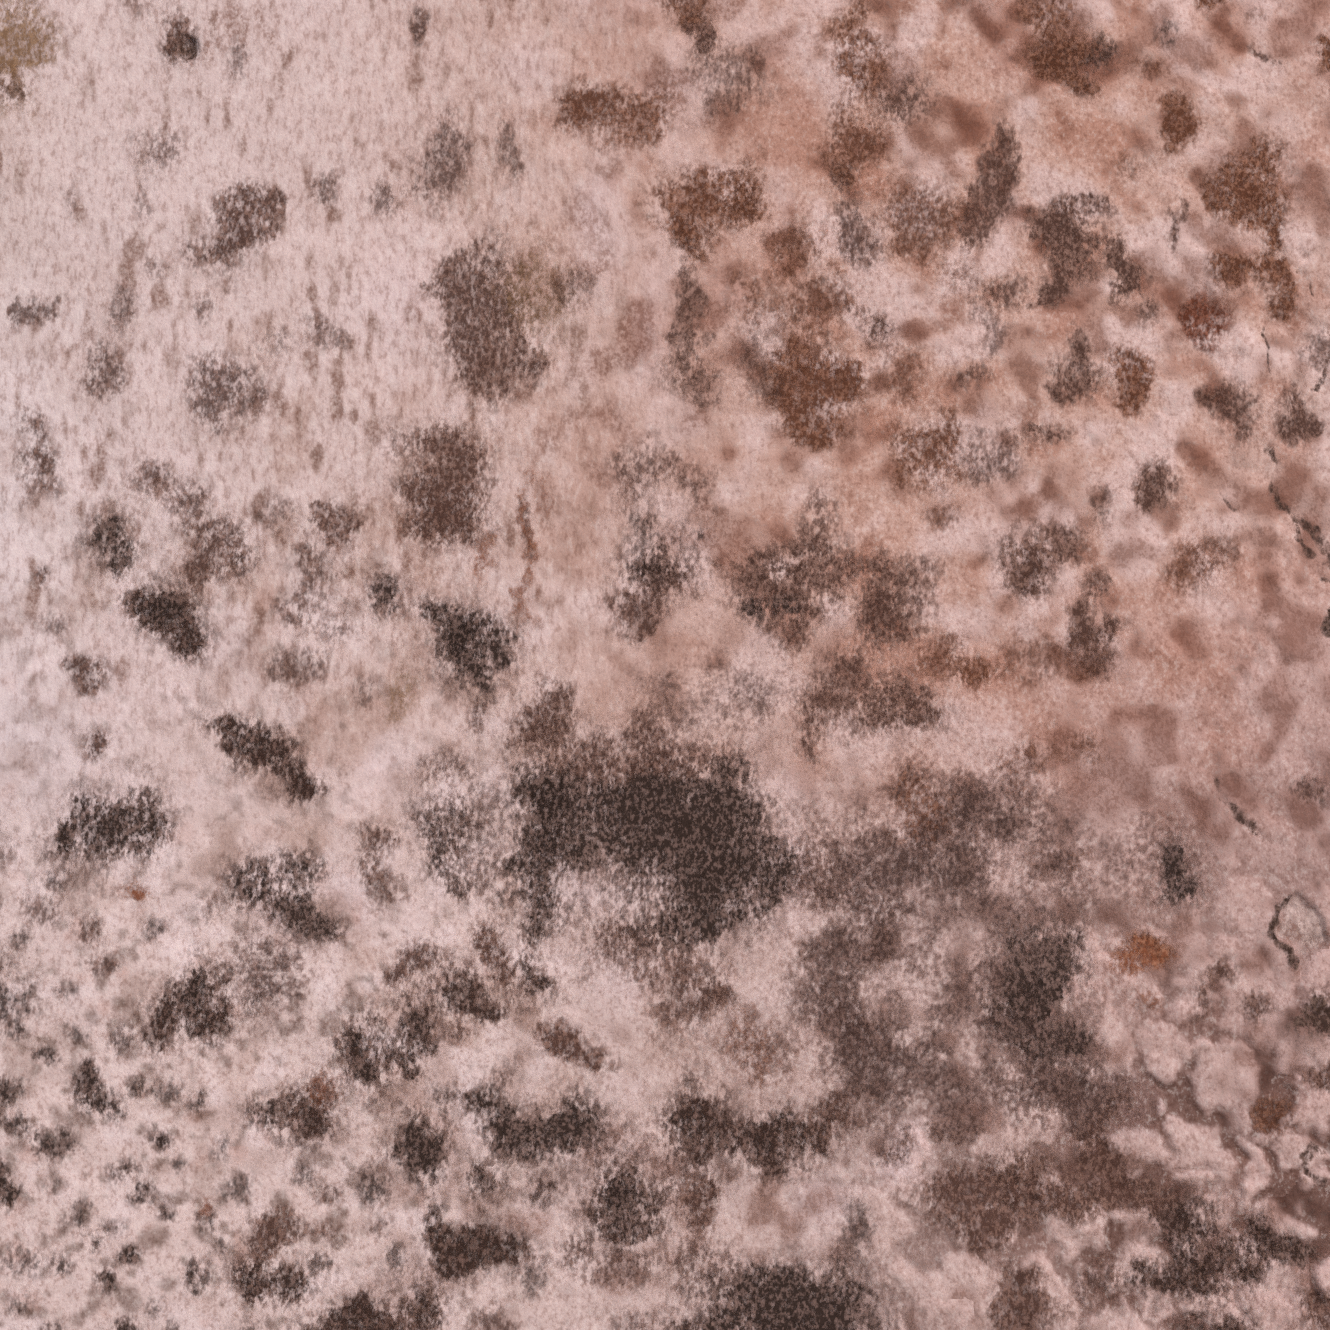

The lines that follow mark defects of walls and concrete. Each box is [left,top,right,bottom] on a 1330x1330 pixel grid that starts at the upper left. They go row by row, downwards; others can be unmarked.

leakage [185,183,287,267]
leakage [959,121,1157,346]
leakage [420,237,550,402]
leakage [122,461,246,658]
leakage [731,498,938,651]
crack [1265,449,1330,580]
leakage [420,600,517,730]
leakage [56,787,173,860]
leakage [207,714,326,801]
crack [1215,778,1256,833]
leakage [111,851,338,1051]
leakage [307,683,1316,1330]